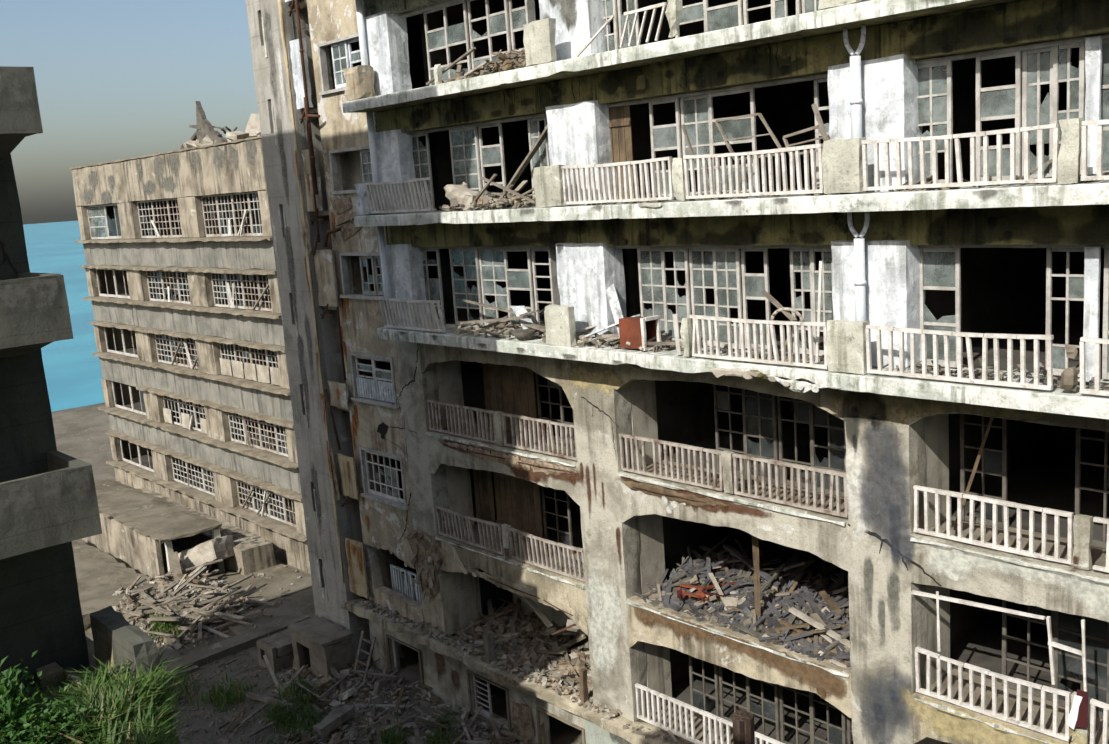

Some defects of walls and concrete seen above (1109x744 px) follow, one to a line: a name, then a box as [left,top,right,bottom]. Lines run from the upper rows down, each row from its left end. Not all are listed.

damp [543,0,576,28]
damp [599,67,649,98]
damp [694,52,804,88]
crack [384,343,418,457]
damp [563,354,621,393]
corrosion [442,440,604,512]
damp [838,391,1048,564]
crack [848,524,942,586]
damp [864,558,898,637]
damp [863,671,911,744]